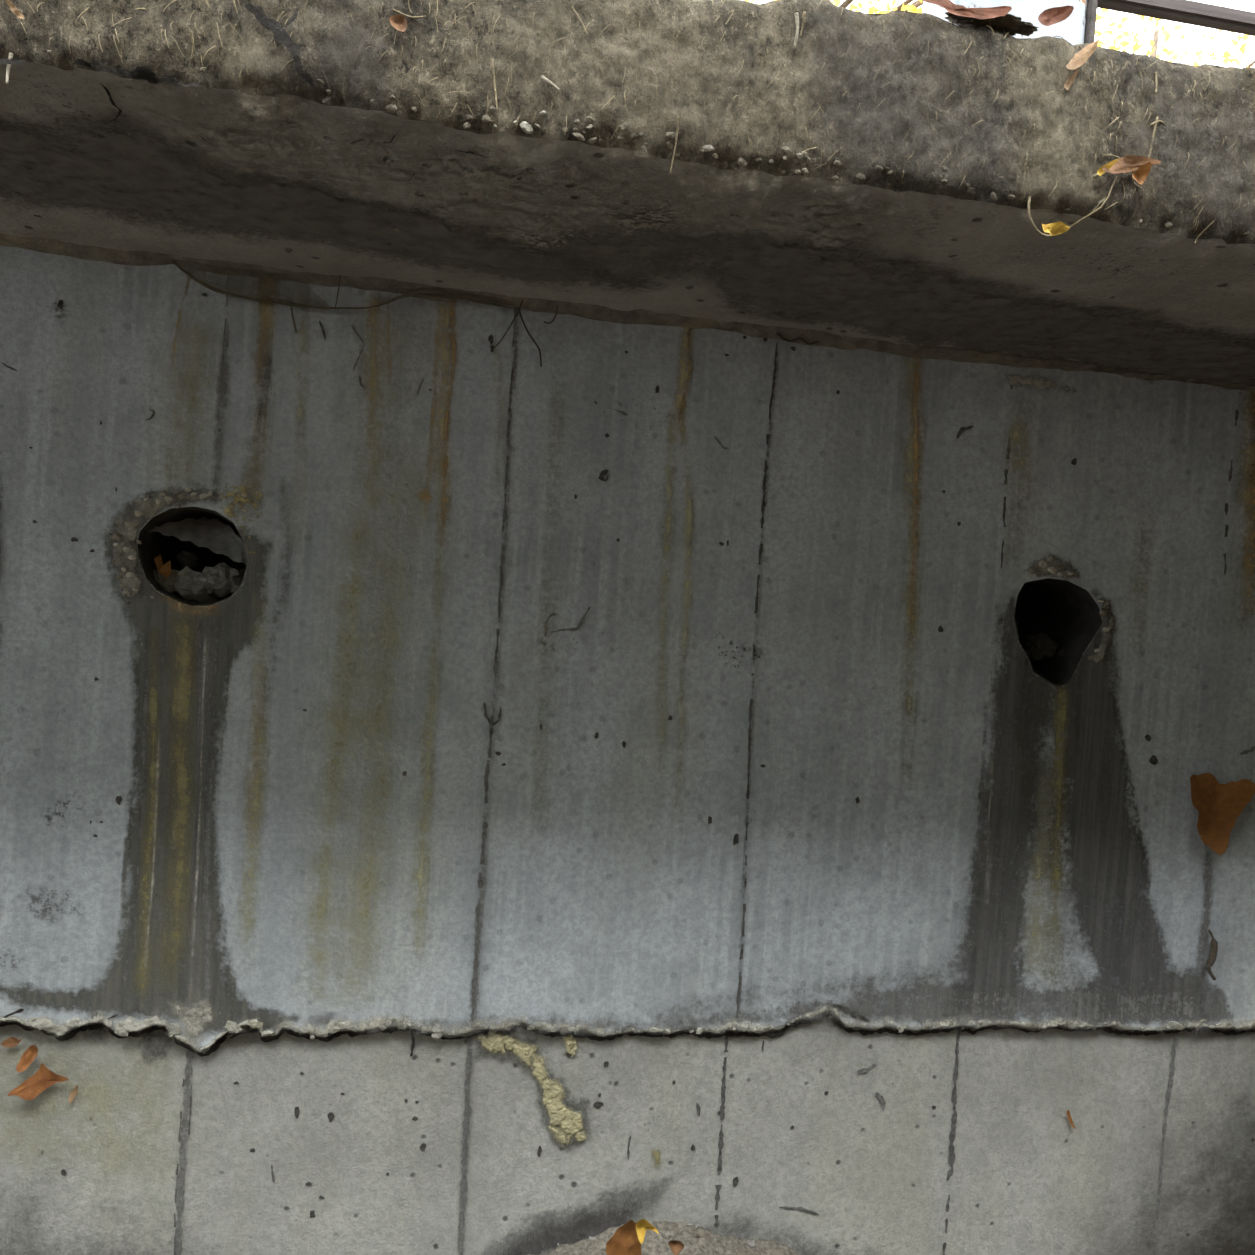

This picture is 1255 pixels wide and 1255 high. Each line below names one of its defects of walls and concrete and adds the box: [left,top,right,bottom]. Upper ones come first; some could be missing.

spalling [111,484,263,601]
spalling [1028,553,1080,579]
spalling [1087,590,1115,665]
leakage [0,529,342,1062]
crack [0,307,1255,1255]
leakage [404,598,1233,1034]
spalling [0,1007,1125,1157]
spalling [1140,1019,1255,1031]
leakage [1178,1122,1255,1255]